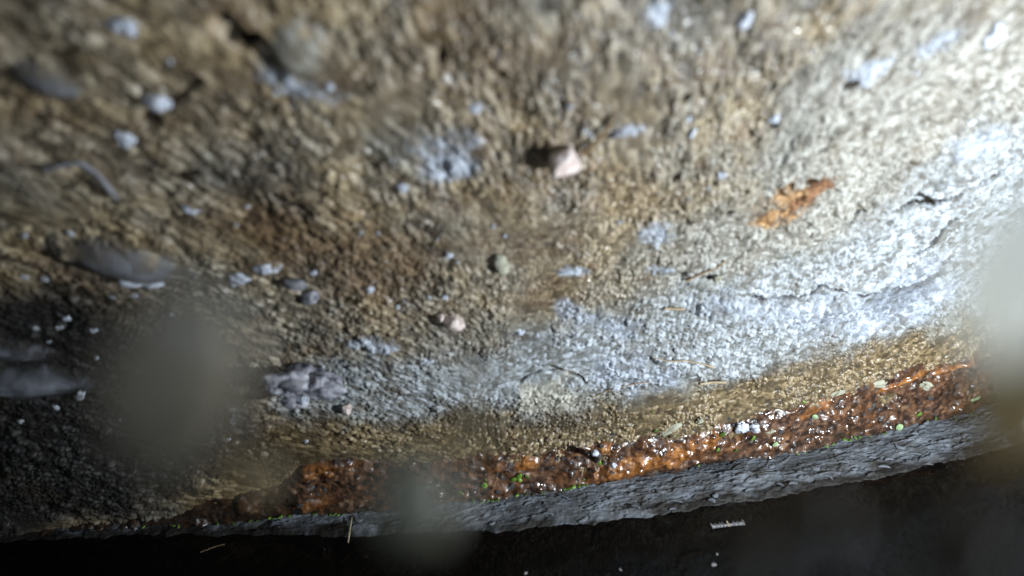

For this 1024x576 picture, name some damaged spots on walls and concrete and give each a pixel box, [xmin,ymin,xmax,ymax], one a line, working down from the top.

corrosion [750,176,834,229]
corrosion [439,354,982,503]
corrosion [69,457,382,532]